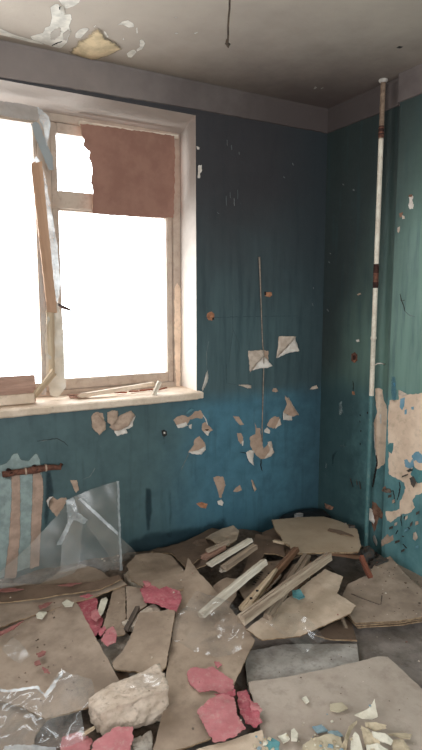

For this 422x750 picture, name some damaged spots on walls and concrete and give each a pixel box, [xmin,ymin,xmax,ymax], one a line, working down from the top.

peeling [0,0,96,48]
peeling [118,20,145,58]
peeling [248,336,299,372]
peeling [91,410,135,436]
peeling [174,408,212,470]
peeling [233,388,299,470]
peeling [213,476,225,506]
peeling [369,388,422,552]